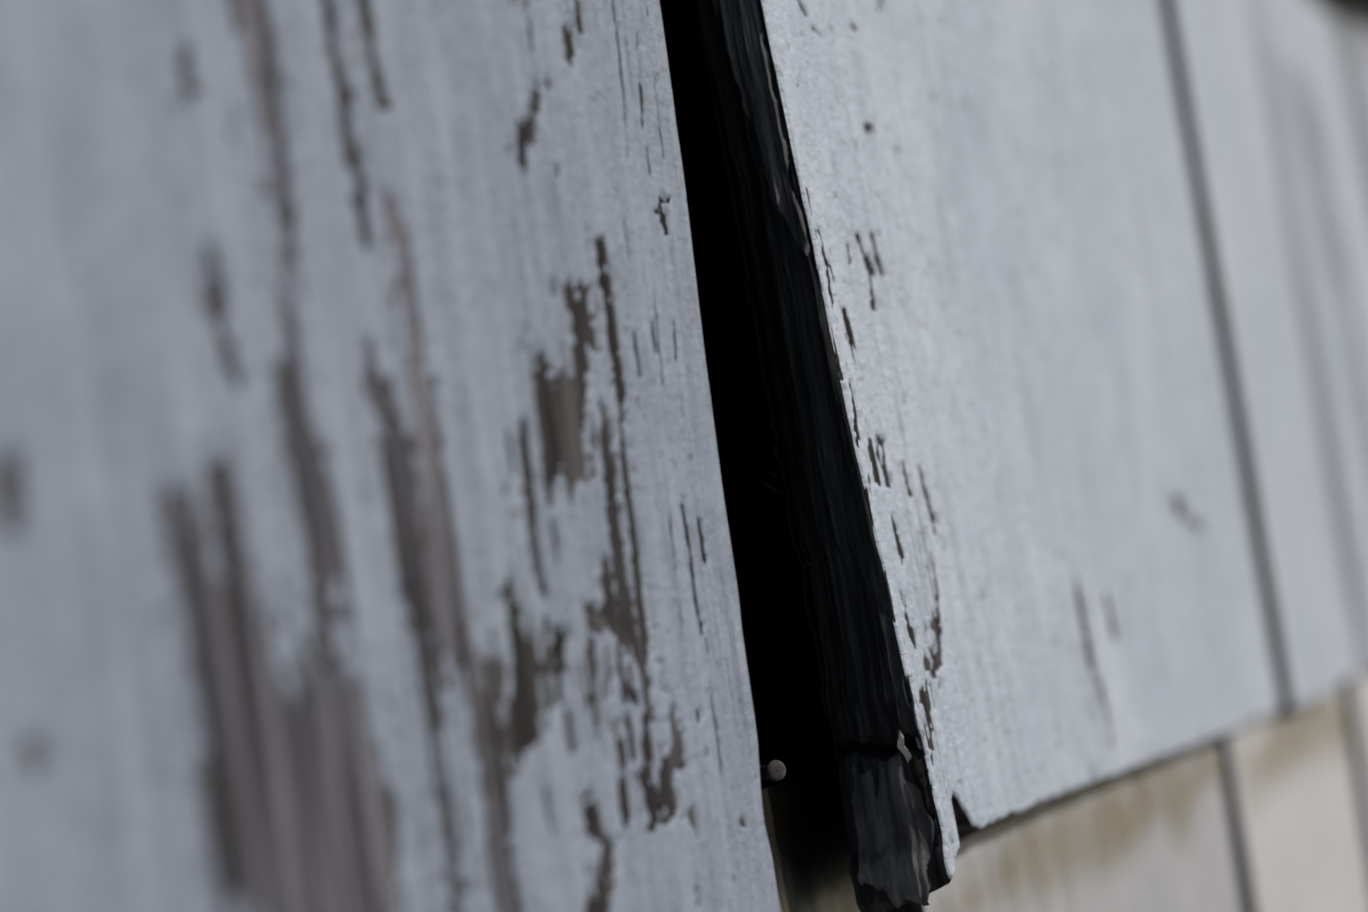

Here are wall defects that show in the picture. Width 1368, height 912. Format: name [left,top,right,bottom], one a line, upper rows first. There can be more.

peeling [146,0,415,912]
peeling [321,0,698,912]
crack [653,293,677,385]
crack [805,186,861,449]
peeling [846,232,884,311]
crack [649,676,668,801]
crack [669,501,721,775]
crack [881,561,896,622]
crack [840,675,939,847]
peeling [852,434,945,908]